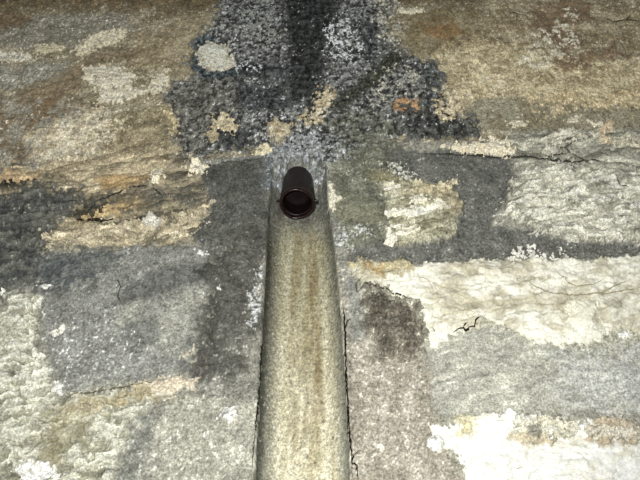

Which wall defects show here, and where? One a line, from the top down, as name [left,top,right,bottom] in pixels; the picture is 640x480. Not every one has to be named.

leakage [163,0,484,193]
crack [424,139,627,186]
crack [77,215,146,223]
crack [96,185,163,201]
crack [415,273,491,333]
crack [343,305,359,477]